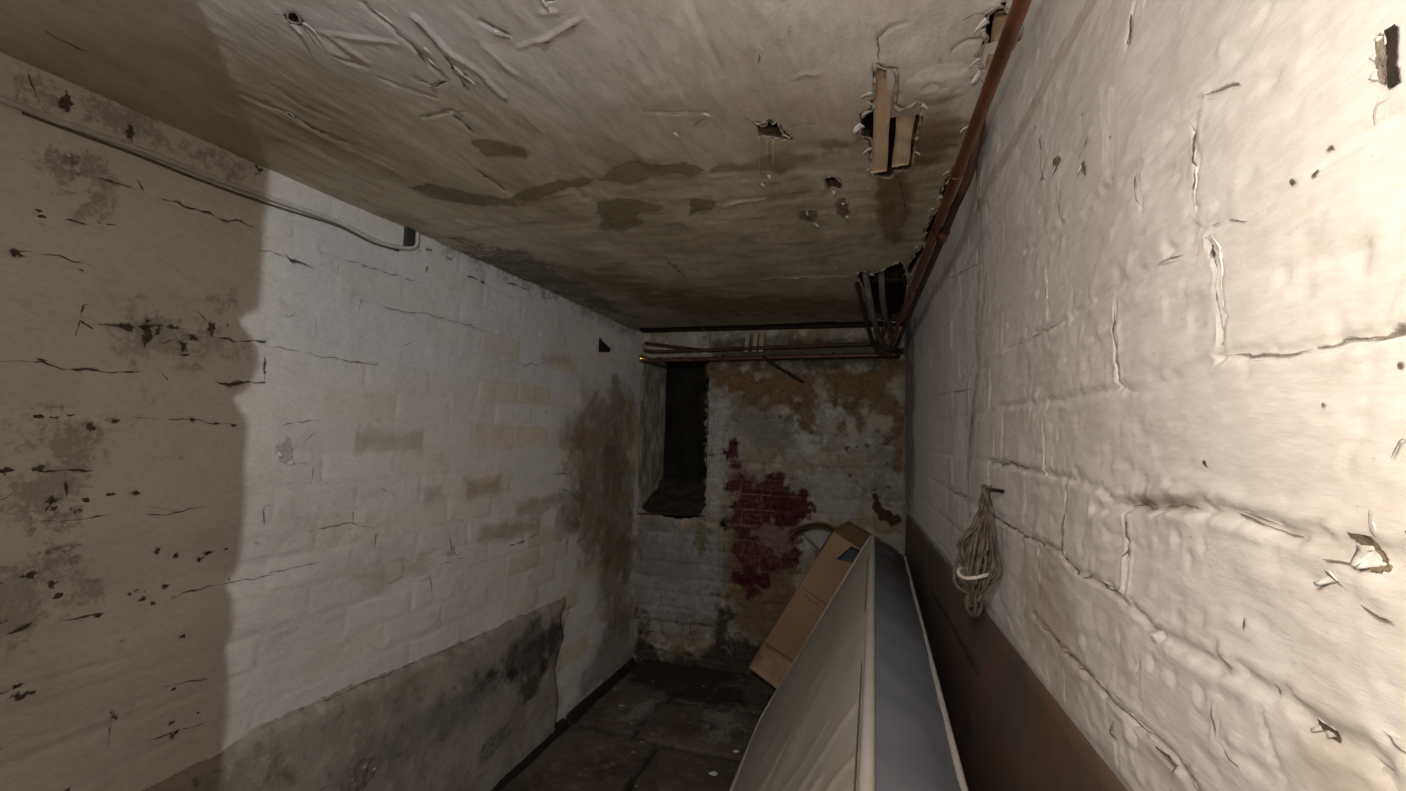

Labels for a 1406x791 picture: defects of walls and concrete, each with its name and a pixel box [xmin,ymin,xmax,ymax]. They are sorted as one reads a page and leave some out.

flaking render [973,4,1002,34]
leakage [471,140,527,158]
leakage [411,161,702,231]
crack [1155,83,1406,361]
crack [11,250,101,273]
crack [98,177,492,346]
crack [5,304,168,380]
spalling [1313,532,1392,587]
leakage [420,621,563,737]